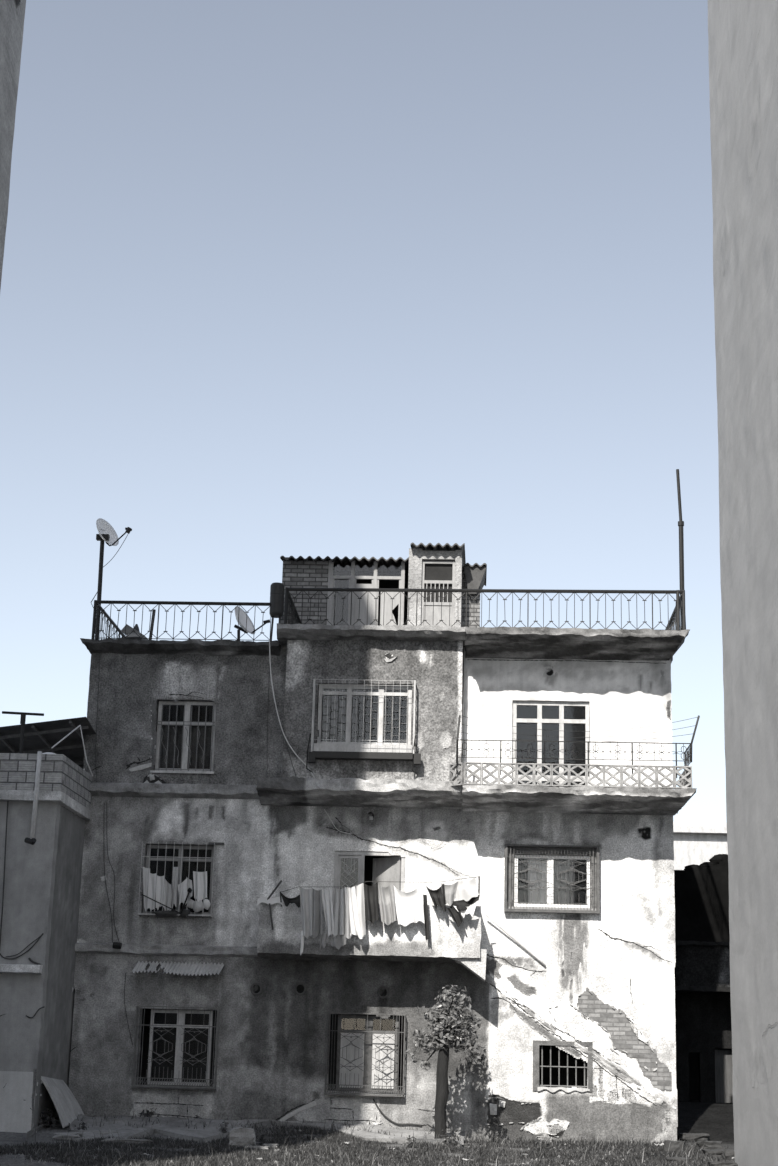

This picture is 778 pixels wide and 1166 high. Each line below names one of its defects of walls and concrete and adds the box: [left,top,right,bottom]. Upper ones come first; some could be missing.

crack [597,929,670,962]
flaking render [486,958,672,1107]